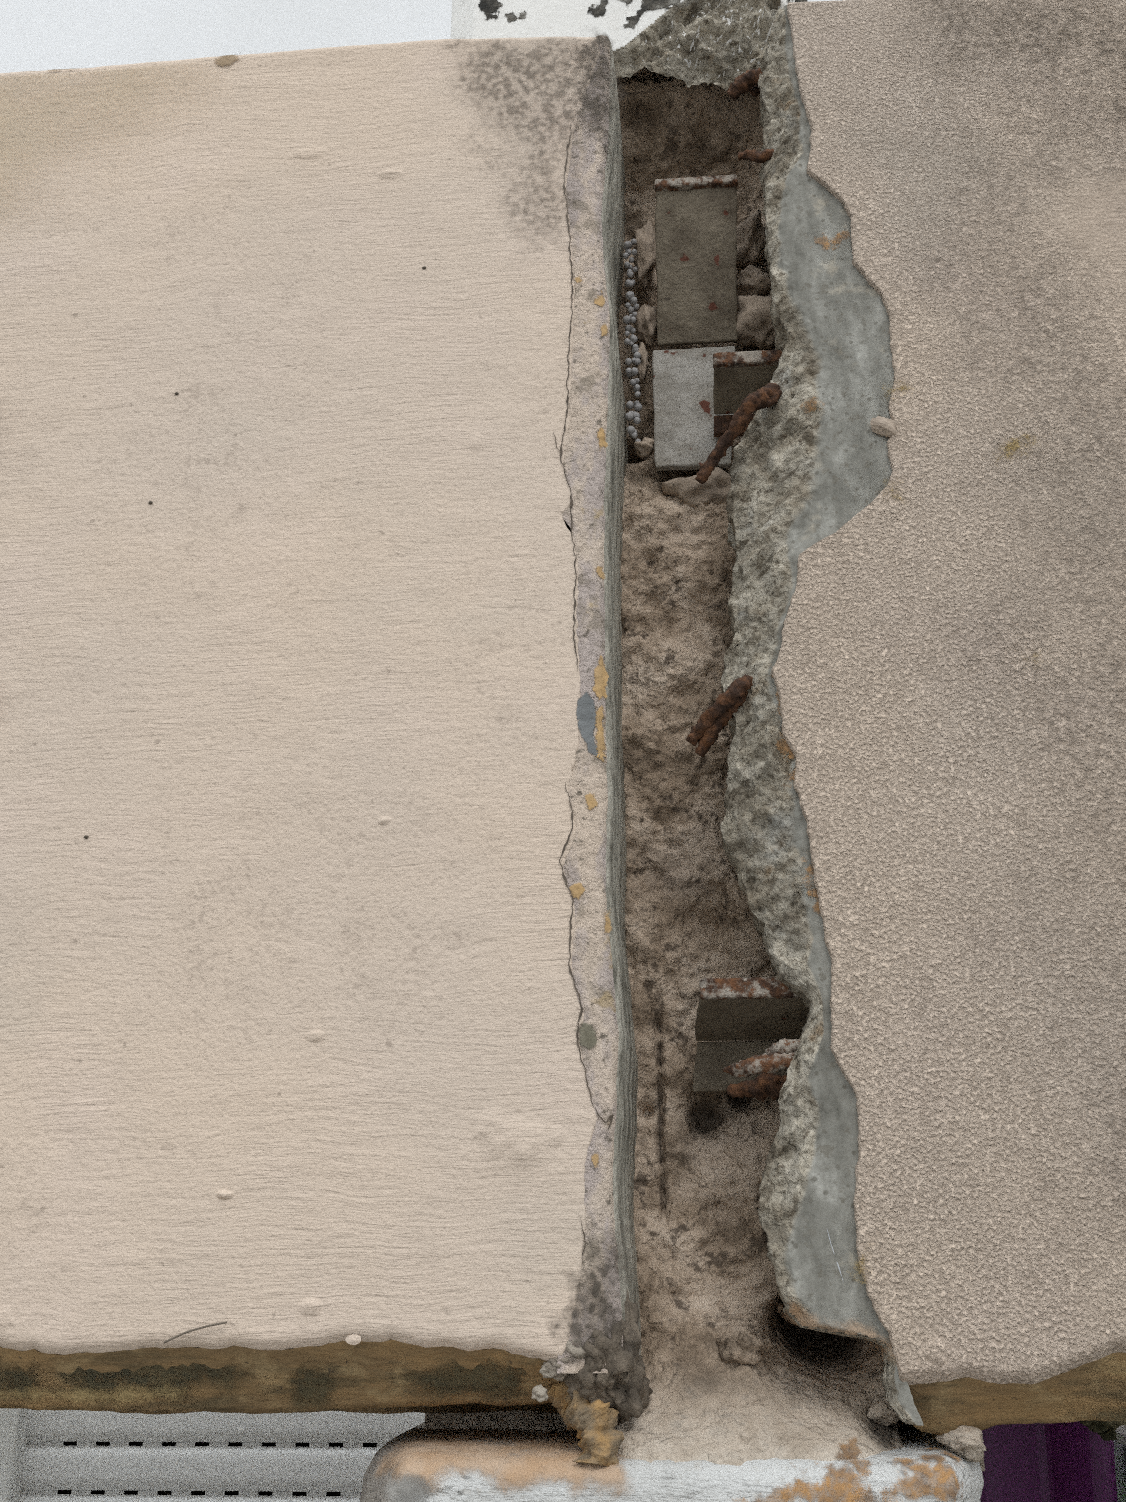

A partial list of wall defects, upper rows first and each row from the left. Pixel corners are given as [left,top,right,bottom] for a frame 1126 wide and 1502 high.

spalling [587,0,924,1426]
leakage [63,1389,153,1402]
spalling [531,1289,653,1467]
corrosion [743,1437,963,1502]